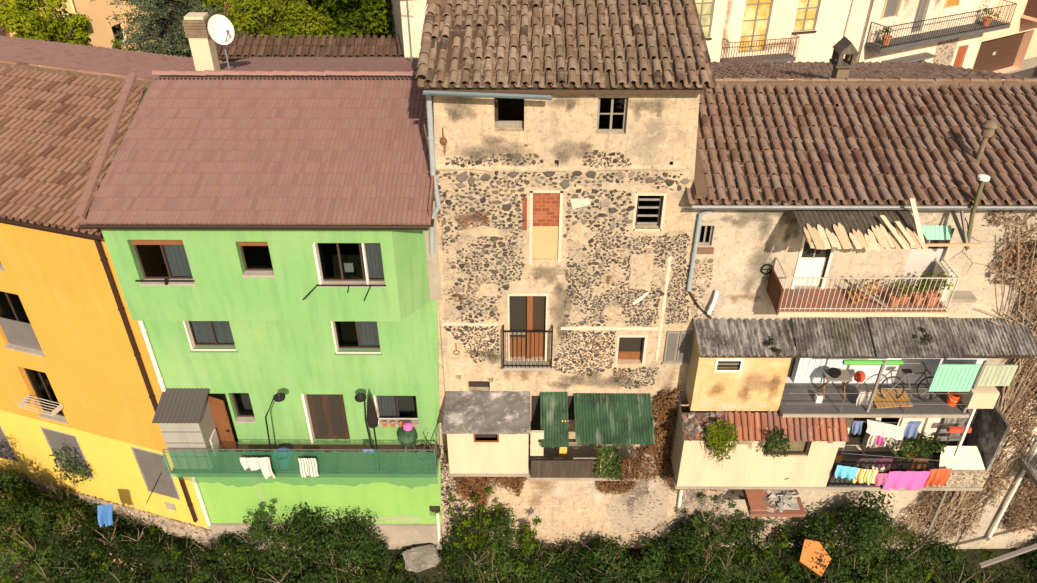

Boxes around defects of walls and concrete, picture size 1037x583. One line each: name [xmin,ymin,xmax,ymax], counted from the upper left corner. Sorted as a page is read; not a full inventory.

flaking render [429,150,715,389]